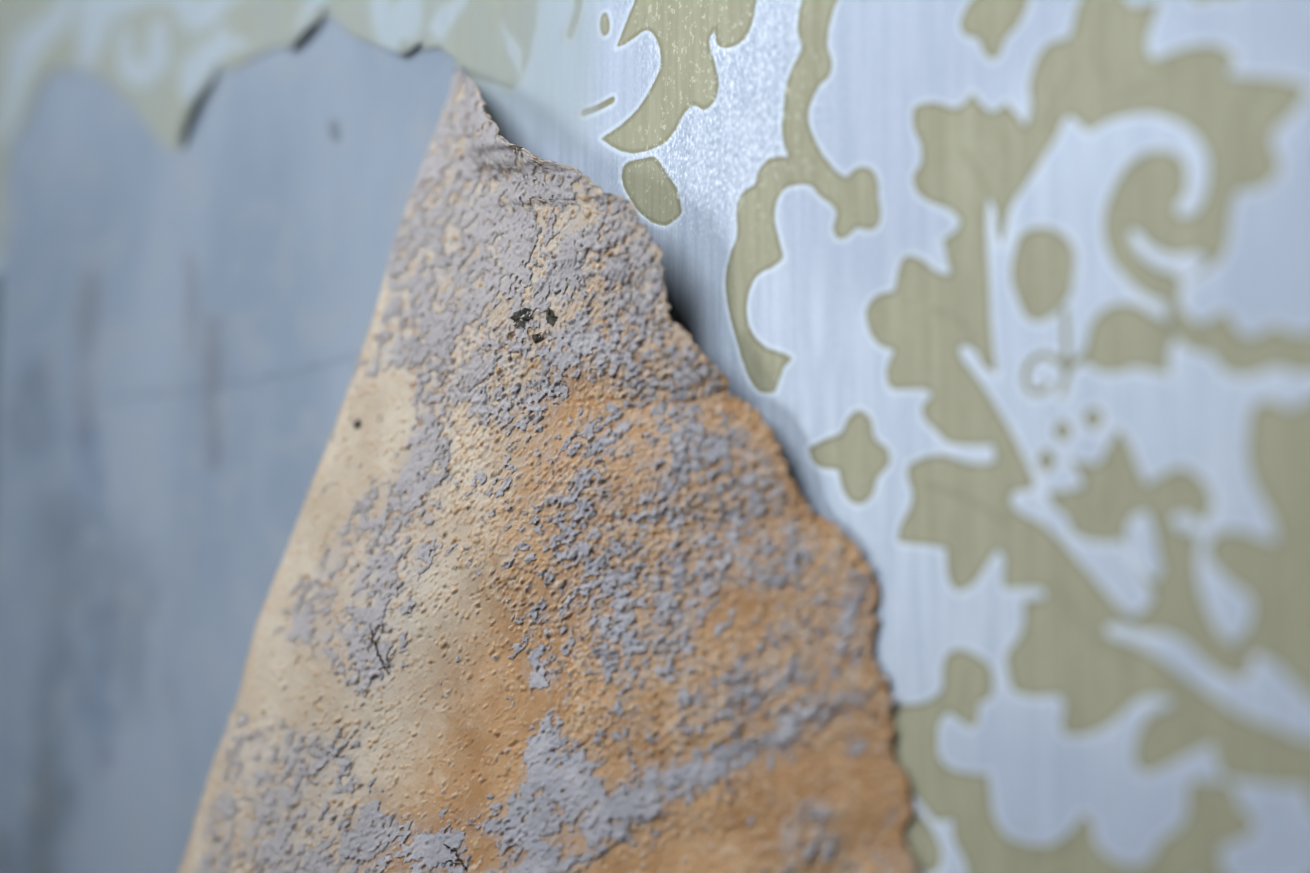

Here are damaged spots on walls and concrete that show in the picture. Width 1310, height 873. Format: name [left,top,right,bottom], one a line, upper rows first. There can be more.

flaking render [0,14,830,873]